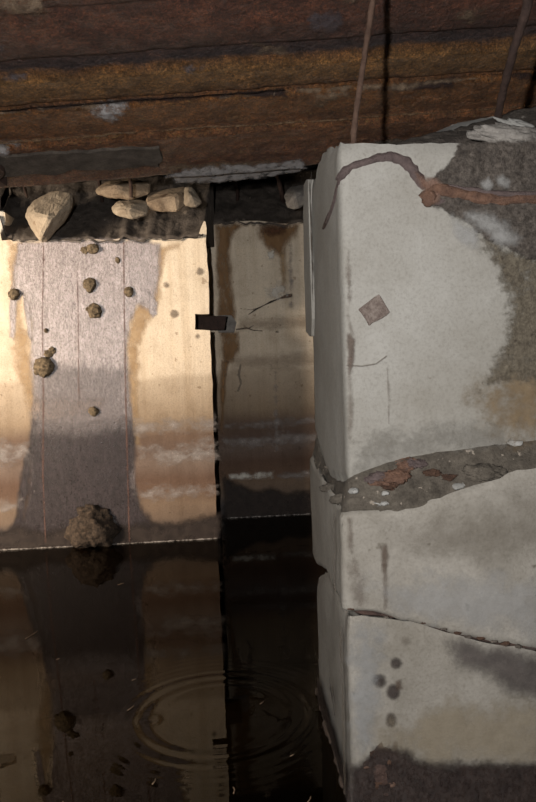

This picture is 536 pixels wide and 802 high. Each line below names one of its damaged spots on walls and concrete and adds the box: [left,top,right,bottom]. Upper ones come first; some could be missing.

rust [216,224,240,318]
rust [260,223,298,289]
spalling [418,139,536,384]
water stain [0,239,311,550]
rust [221,333,239,428]
crack [347,608,536,651]
water stain [317,674,536,802]